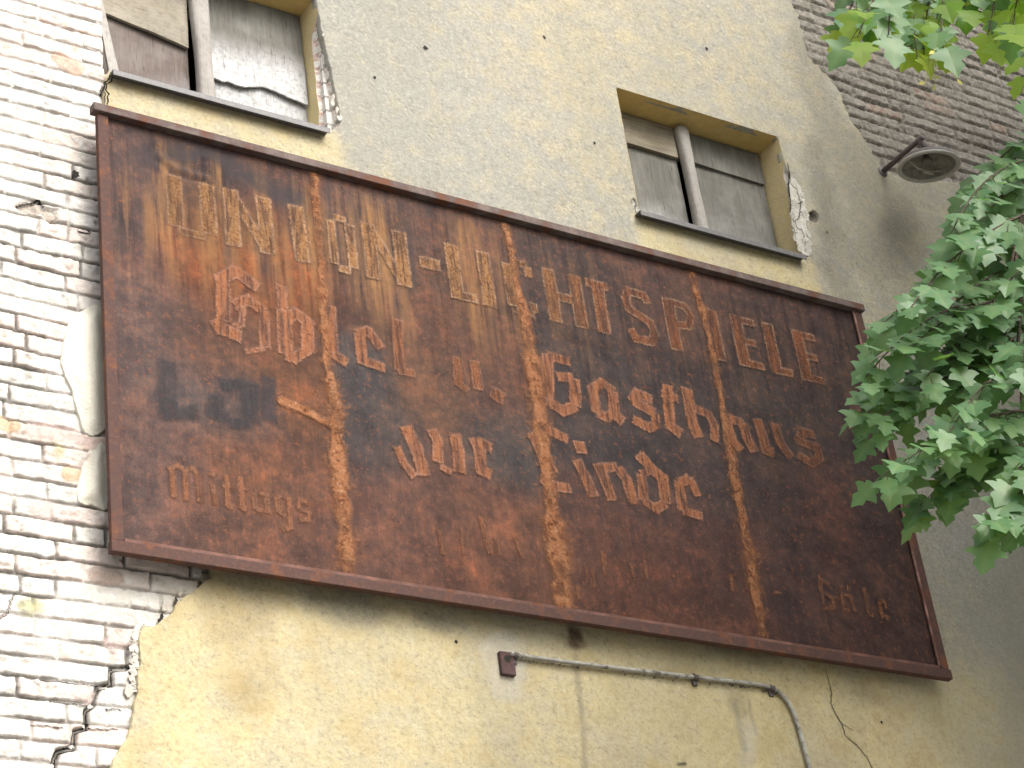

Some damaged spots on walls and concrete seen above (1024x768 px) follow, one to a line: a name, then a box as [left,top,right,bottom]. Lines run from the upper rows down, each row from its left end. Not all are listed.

spalling [312,17,343,131]
spalling [16,200,57,224]
peeling [784,161,813,256]
peeling [0,416,85,443]
peeling [29,501,86,521]
crack [158,581,202,623]
corrosion [568,628,583,649]
spalling [124,623,148,697]
peeling [72,686,93,704]
crack [32,667,130,768]
crack [825,668,872,767]